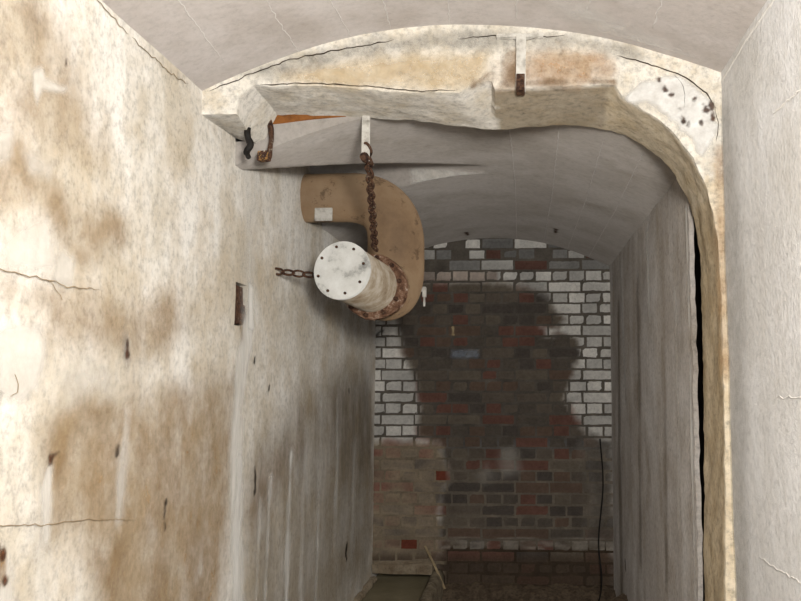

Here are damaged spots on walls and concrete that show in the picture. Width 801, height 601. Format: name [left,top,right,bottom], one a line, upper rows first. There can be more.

crack [97,0,186,84]
peeling [626,77,718,155]
crack [0,268,99,299]
water stain [129,285,253,601]
crack [0,518,134,527]
rust [0,548,8,586]